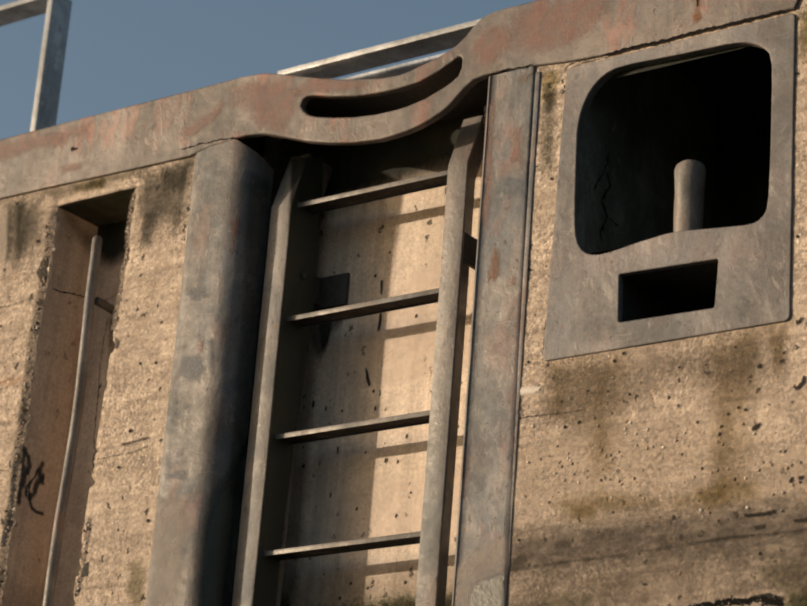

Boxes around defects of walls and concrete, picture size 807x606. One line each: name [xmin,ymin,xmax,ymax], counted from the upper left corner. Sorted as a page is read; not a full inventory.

crack [180,137,234,150]
crack [92,322,148,471]